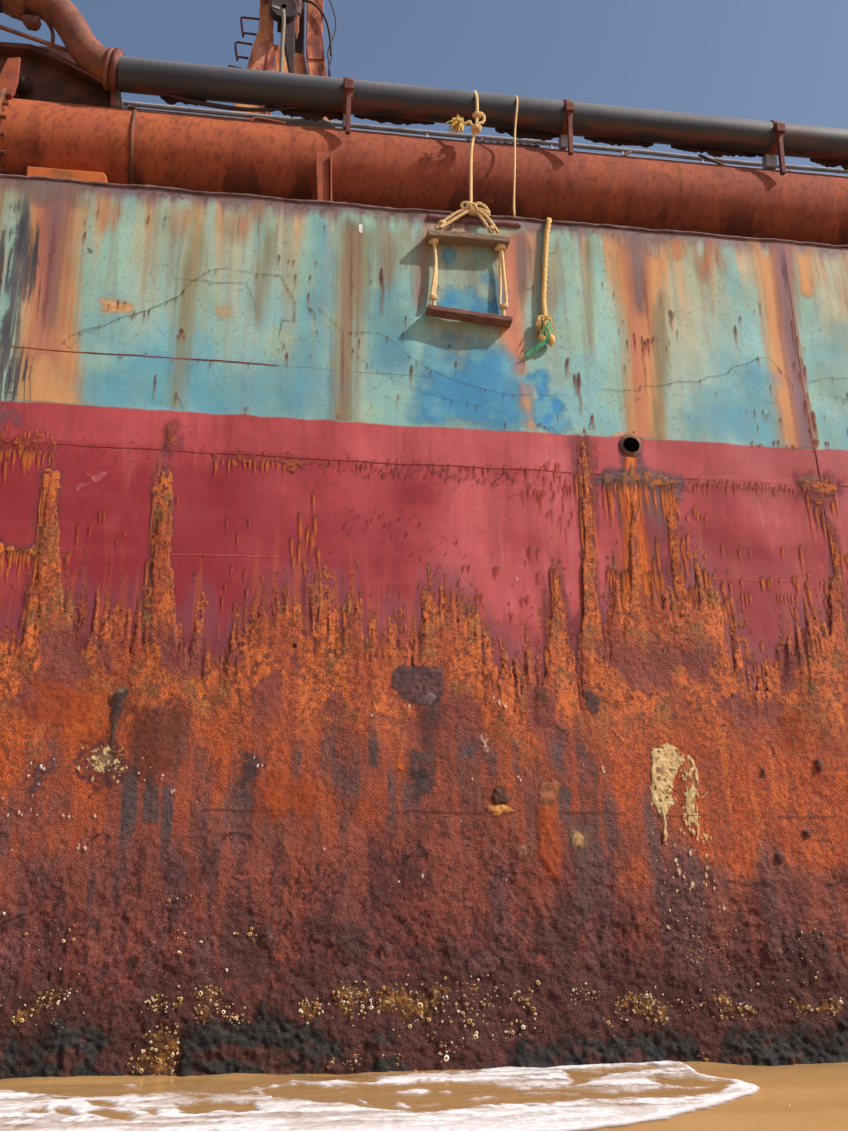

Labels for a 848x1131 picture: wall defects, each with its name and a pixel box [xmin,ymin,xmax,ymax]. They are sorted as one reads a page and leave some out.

corrosion [16,179,86,403]
corrosion [101,299,150,319]
corrosion [172,267,191,405]
corrosion [322,209,384,420]
corrosion [495,233,545,428]
corrosion [566,357,582,402]
corrosion [614,235,687,439]
corrosion [746,242,830,450]
corrosion [0,414,848,1076]
peeling [652,755,715,895]